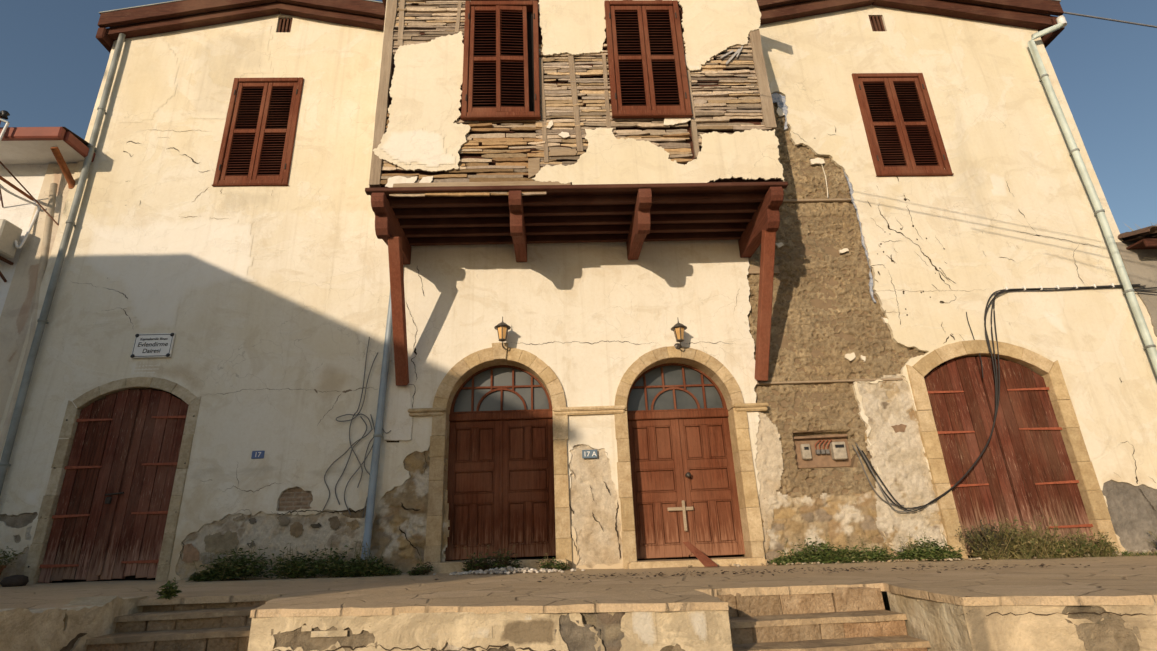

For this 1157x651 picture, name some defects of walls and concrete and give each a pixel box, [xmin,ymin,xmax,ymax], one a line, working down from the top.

peeling [380,128,456,187]
flaking render [663,118,691,126]
crack [867,177,986,344]
crack [982,184,1097,282]
flaking render [747,93,948,564]
flaking render [176,447,450,580]
flaking render [568,444,622,568]
flaking render [1102,480,1157,551]
flaking render [271,624,377,651]
flaking render [431,642,515,651]
flaking render [555,600,625,651]